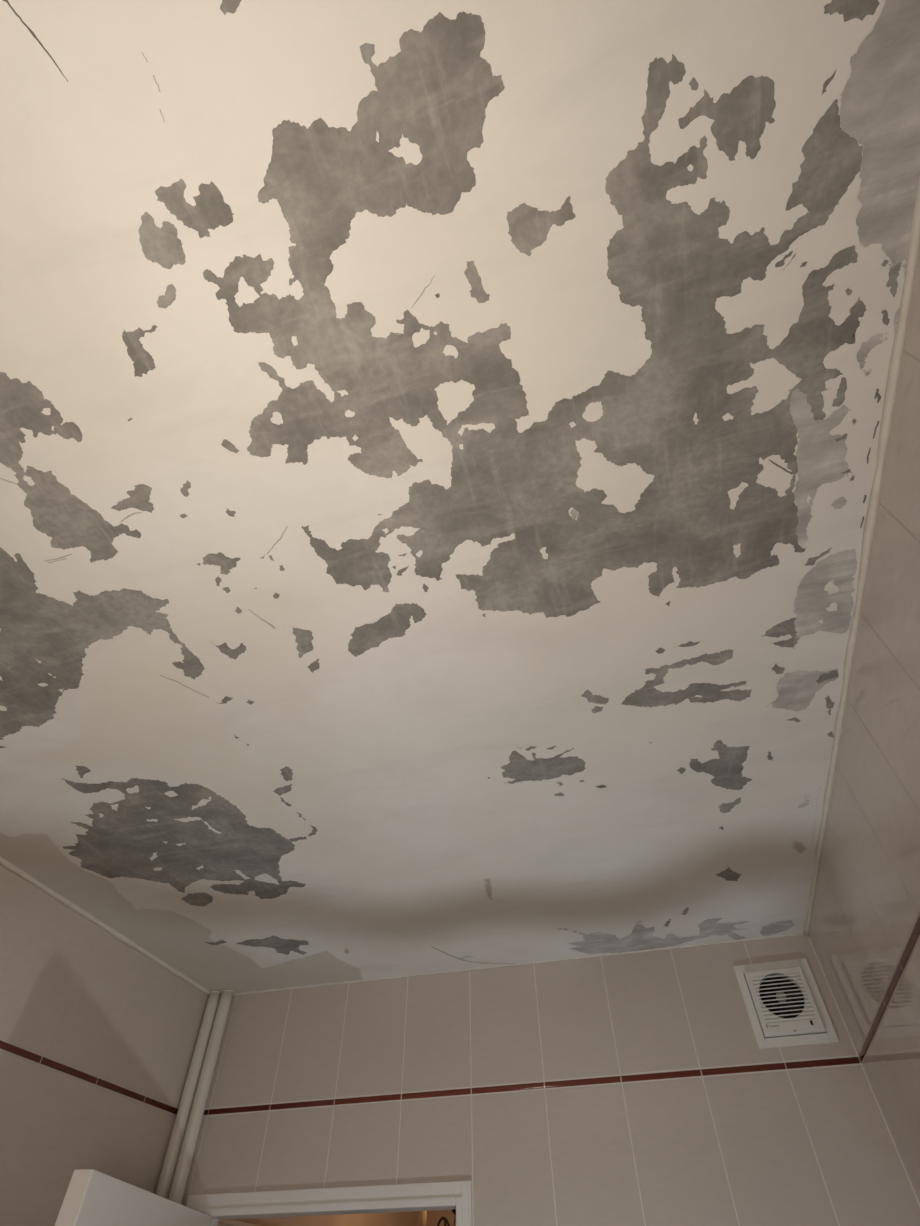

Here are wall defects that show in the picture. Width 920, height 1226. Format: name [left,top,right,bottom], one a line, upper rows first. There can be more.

crack [3,0,68,82]
peeling [824,0,880,22]
peeling [139,179,233,269]
peeling [122,325,157,377]
peeling [197,11,866,657]
peeling [0,372,154,563]
peeling [0,548,205,748]
peeling [581,641,752,713]
peeling [488,746,607,796]
peeling [677,740,752,830]
peeling [62,766,318,907]
peeling [205,936,309,955]